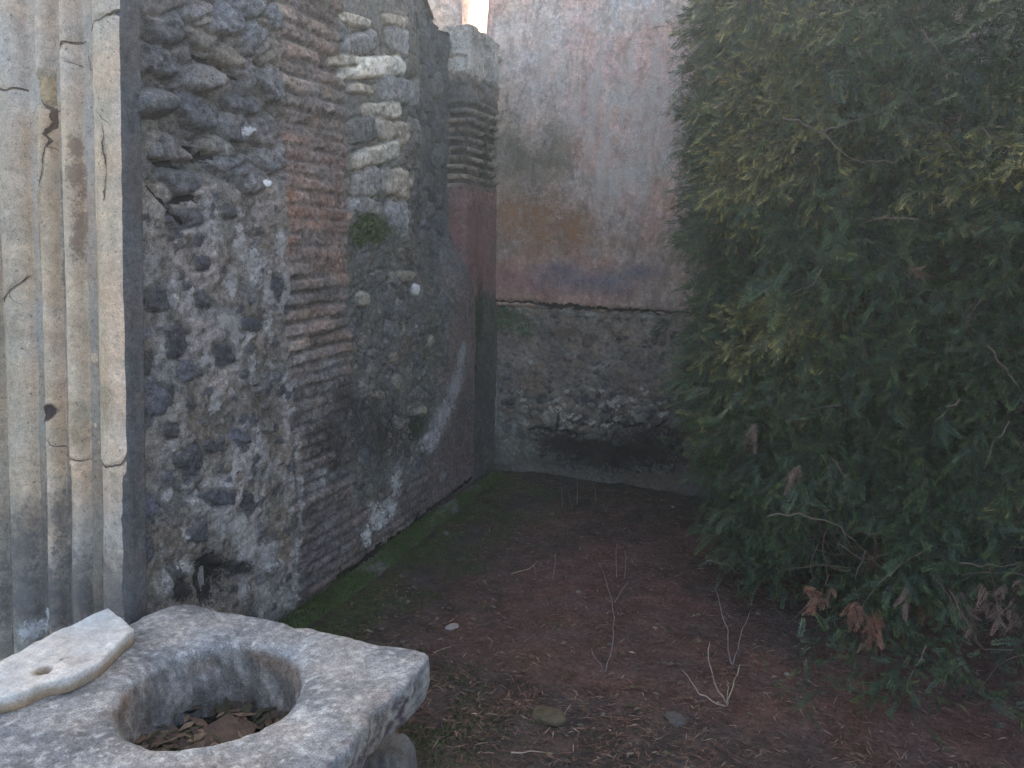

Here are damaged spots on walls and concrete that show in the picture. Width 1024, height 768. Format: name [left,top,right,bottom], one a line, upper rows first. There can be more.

crack [0,87,61,185]
crack [97,112,110,200]
crack [497,300,690,316]
flaking render [515,387,670,430]
leakage [360,461,403,549]